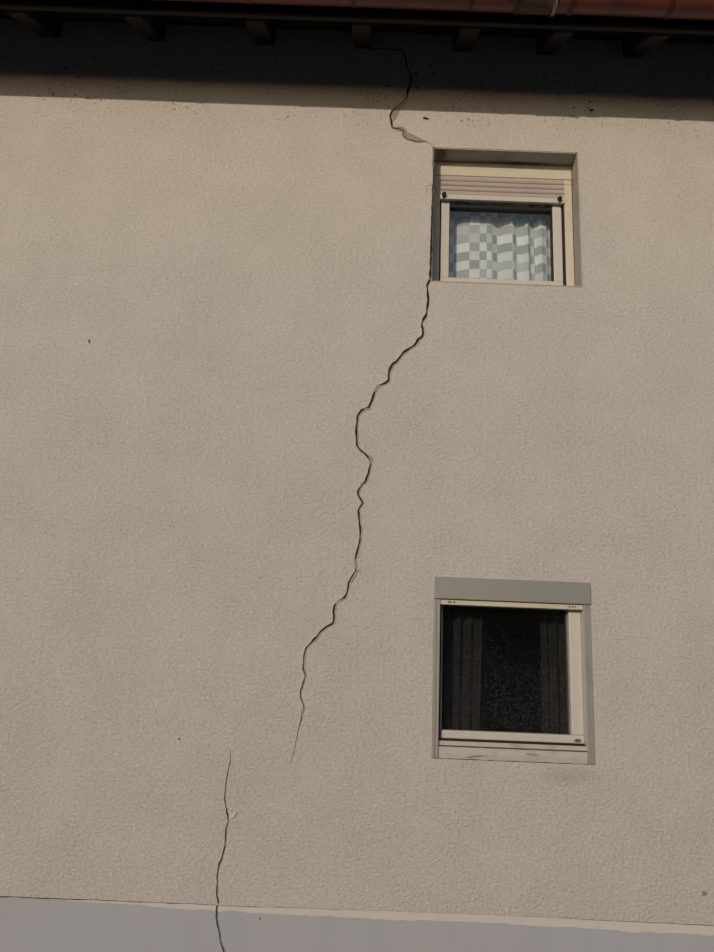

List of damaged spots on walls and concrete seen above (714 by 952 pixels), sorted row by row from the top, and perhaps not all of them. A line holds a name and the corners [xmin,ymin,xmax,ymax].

crack [291,48,434,760]
crack [0,750,256,952]